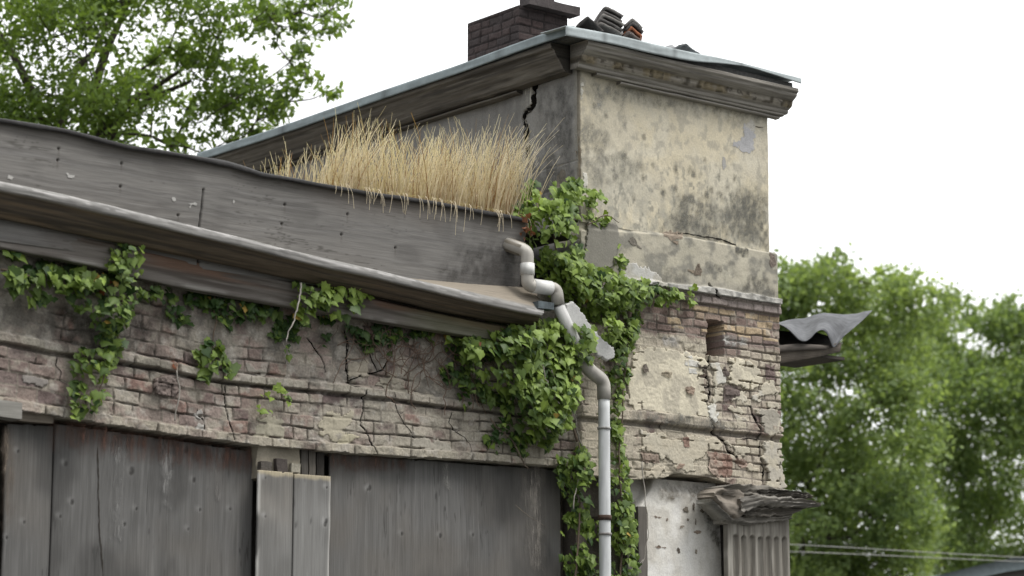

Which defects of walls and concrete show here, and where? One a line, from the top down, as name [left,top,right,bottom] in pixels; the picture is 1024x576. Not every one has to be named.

crack [523,84,540,166]
crack [678,233,736,245]
water stain [663,187,765,257]
water stain [743,277,775,297]
crack [307,331,421,453]
flaking render [627,346,787,489]
crack [703,360,764,477]